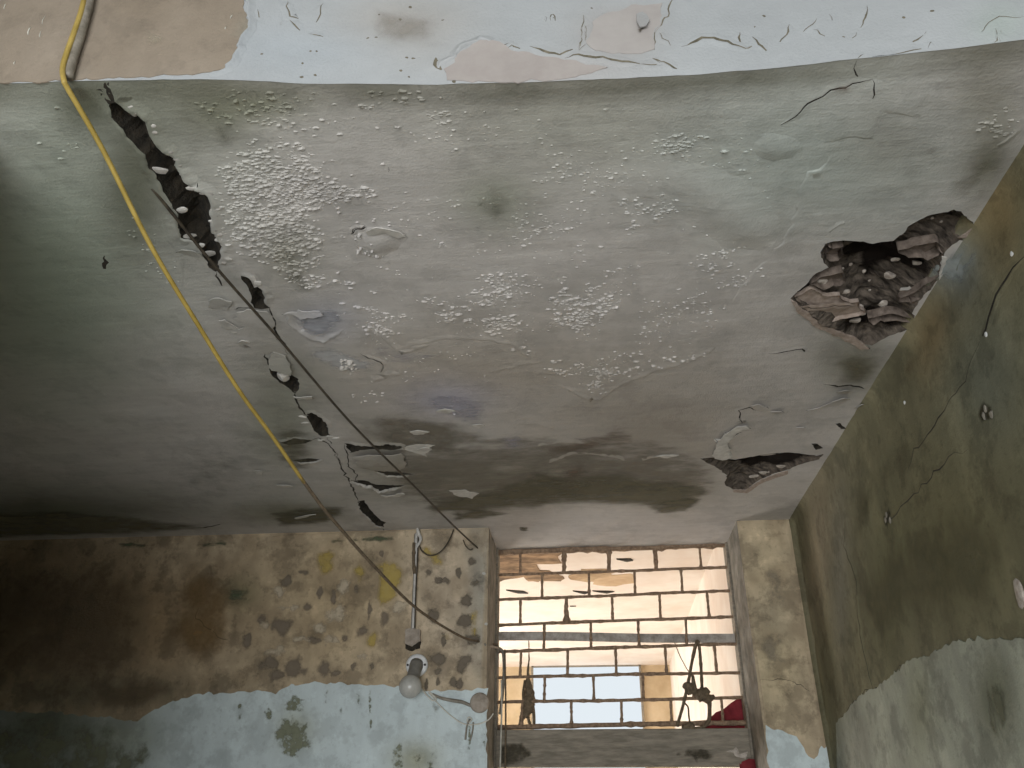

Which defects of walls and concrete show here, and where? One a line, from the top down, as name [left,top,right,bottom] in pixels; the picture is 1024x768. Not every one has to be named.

peeling [405,35,608,84]
crack [500,0,937,125]
crack [94,81,313,416]
spalling [791,210,973,350]
water stain [277,509,339,524]
crack [352,500,388,530]
water stain [383,420,702,519]
spalling [702,426,823,493]
peeling [0,548,488,768]
peeling [766,636,1024,768]